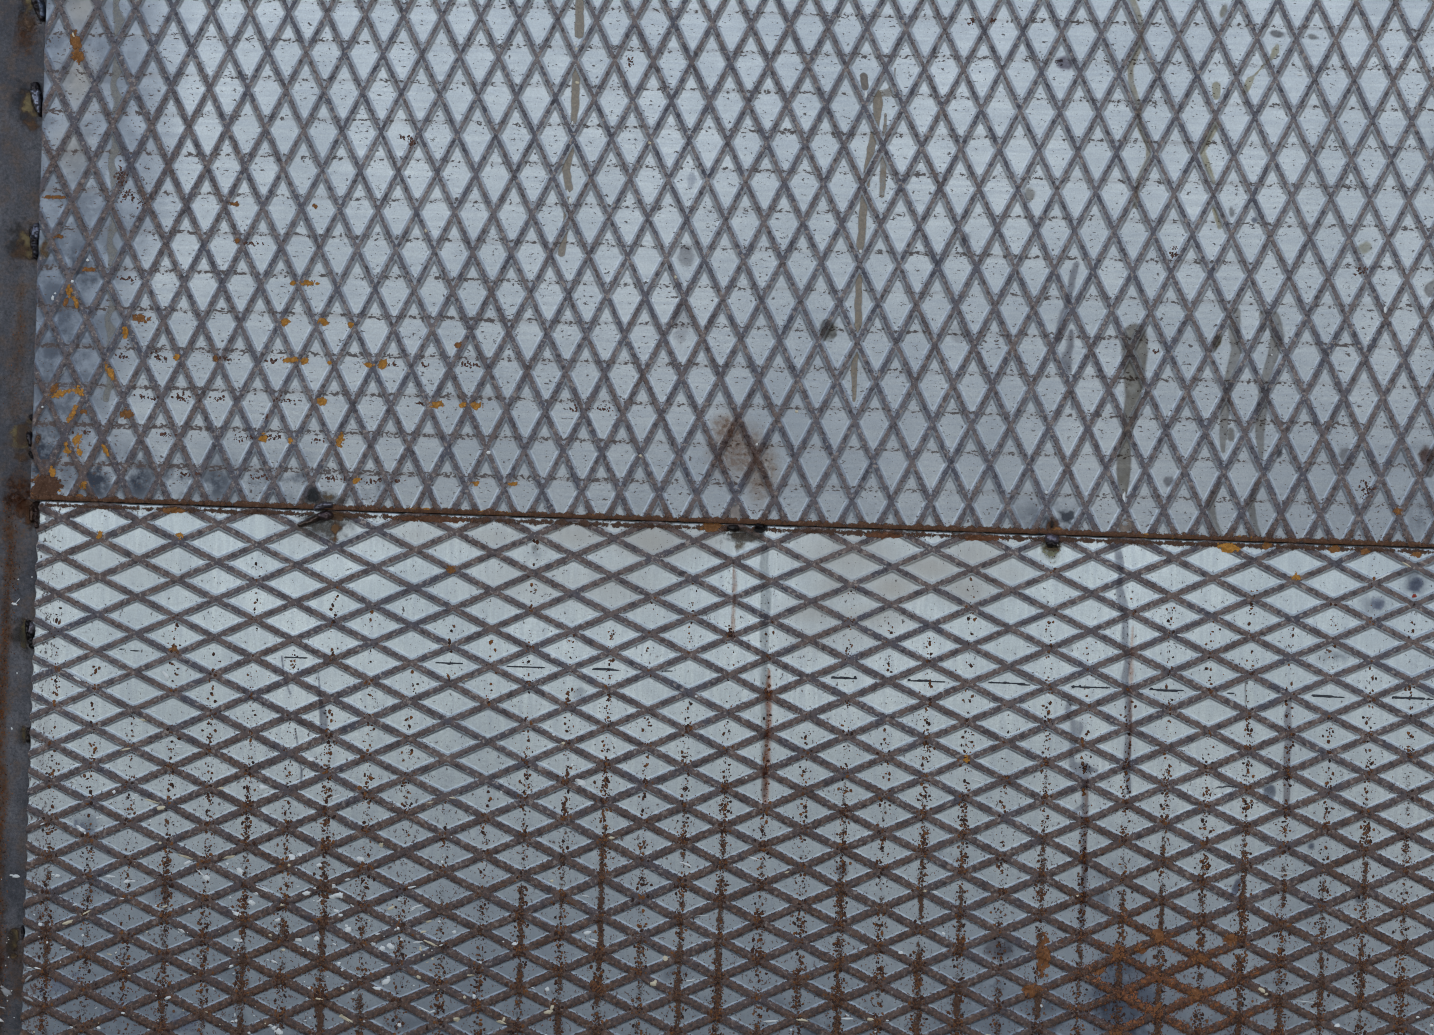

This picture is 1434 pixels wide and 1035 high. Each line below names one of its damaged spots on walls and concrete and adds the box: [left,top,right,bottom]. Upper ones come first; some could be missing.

rust [63,267,96,308]
rust [104,314,151,380]
rust [264,356,309,365]
rust [362,359,399,369]
rust [48,383,91,457]
rust [120,391,236,419]
rust [234,395,299,444]
rust [311,432,345,448]
rust [415,400,483,410]
rust [0,465,1434,1035]